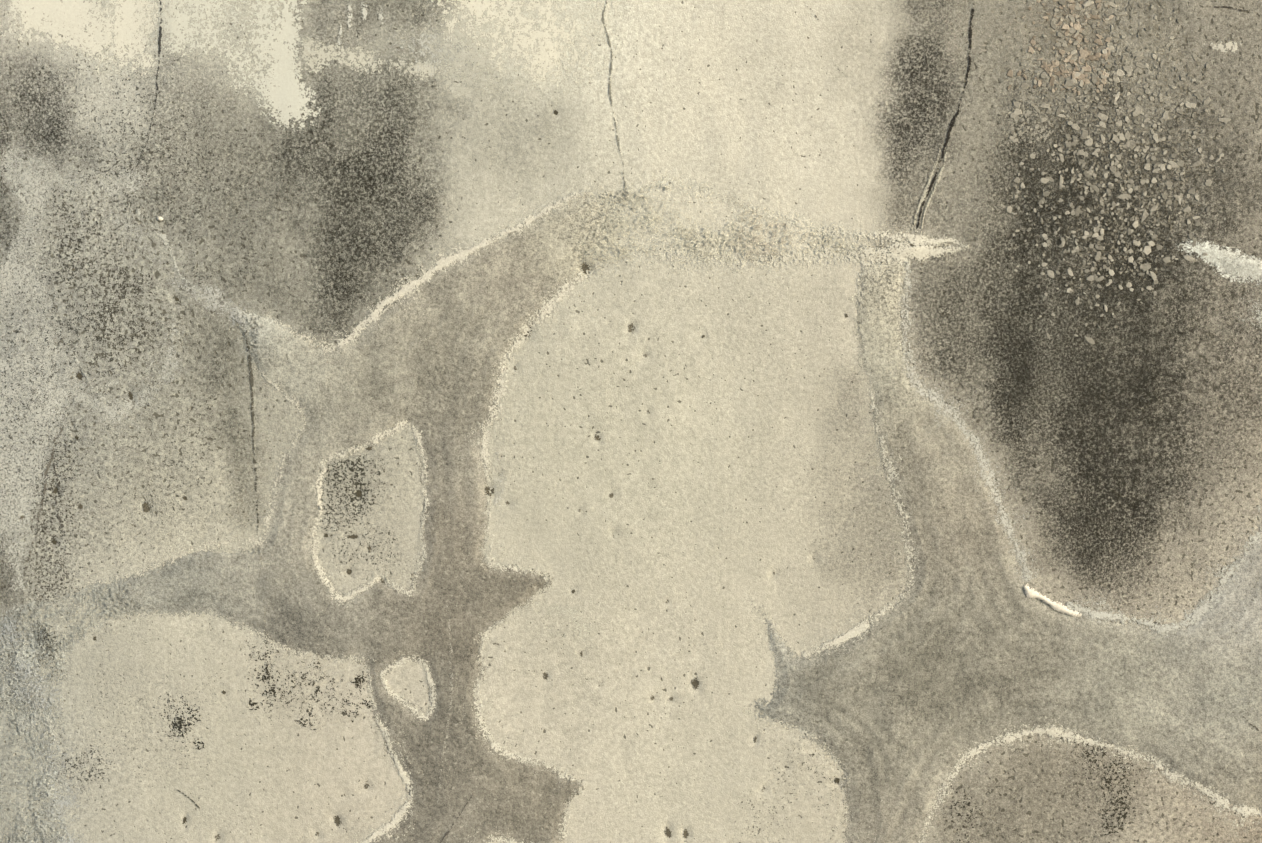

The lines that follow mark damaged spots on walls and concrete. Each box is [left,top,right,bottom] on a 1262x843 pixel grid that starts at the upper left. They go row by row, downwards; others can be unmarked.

leakage [321,0,384,45]
leakage [311,80,431,330]
crack [577,1,712,227]
leakage [892,36,951,221]
crack [868,2,975,263]
leakage [0,31,266,680]
crack [242,309,262,565]
leakage [320,454,401,577]
leakage [986,125,1191,575]
leakage [0,647,221,843]
crack [263,600,276,701]
leakage [1072,736,1140,842]